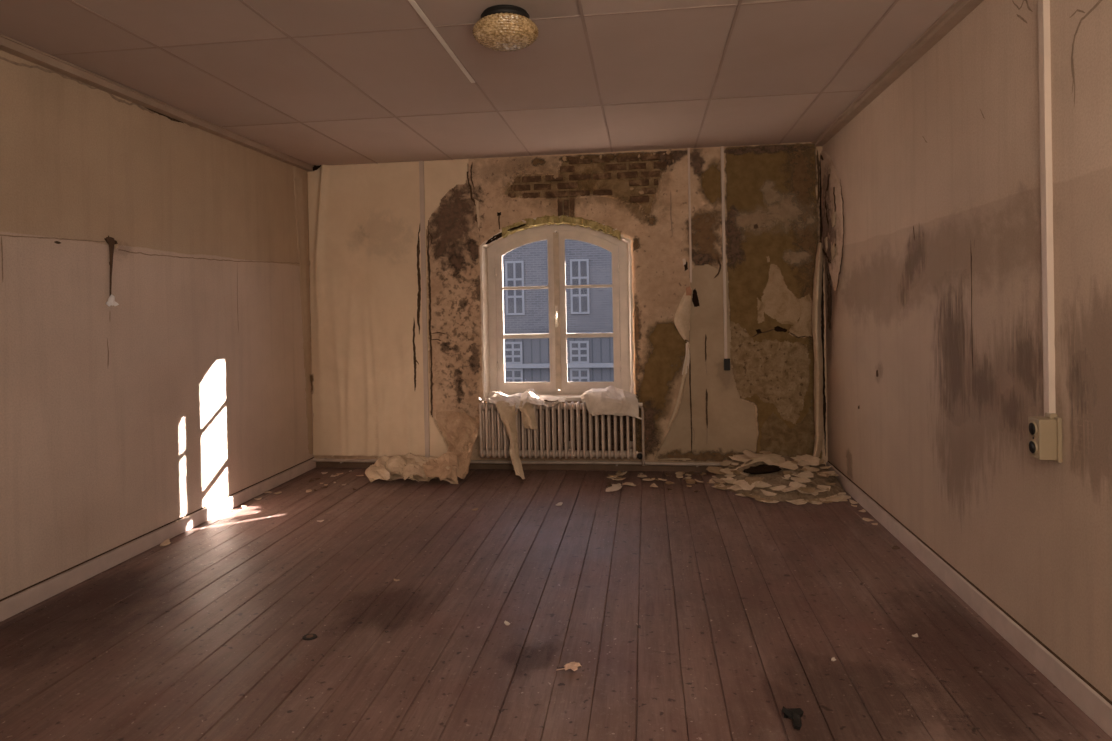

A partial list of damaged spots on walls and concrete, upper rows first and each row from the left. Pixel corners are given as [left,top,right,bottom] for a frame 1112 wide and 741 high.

flaking render [486,150,674,244]